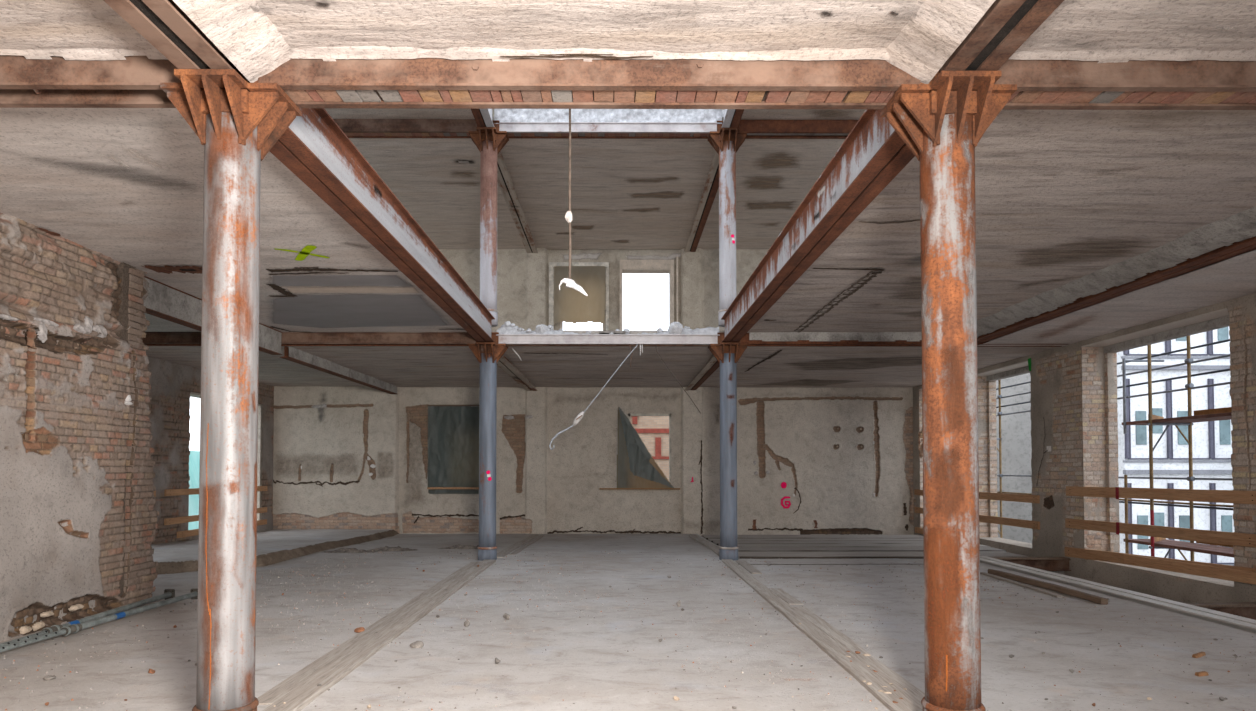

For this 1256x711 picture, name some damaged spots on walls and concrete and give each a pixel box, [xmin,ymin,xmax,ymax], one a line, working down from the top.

rust [944,351,962,430]
spalling [21,427,60,455]
spalling [405,404,429,480]
spalling [502,414,533,494]
spalling [57,519,89,539]
rust [202,423,236,710]
spalling [8,594,124,638]
rust [924,529,959,691]